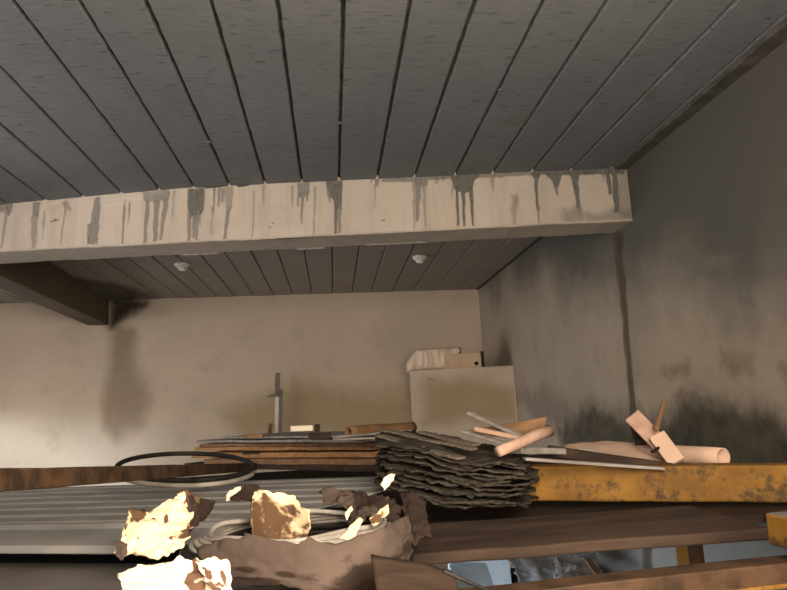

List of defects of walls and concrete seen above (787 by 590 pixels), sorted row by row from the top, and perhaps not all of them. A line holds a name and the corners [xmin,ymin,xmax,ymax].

water stain [31,202,44,247]
water stain [87,197,100,244]
water stain [143,190,174,243]
water stain [187,187,233,241]
water stain [291,182,316,224]
water stain [326,180,343,233]
water stain [413,174,479,226]
water stain [532,168,619,220]
water stain [559,407,634,445]
water stain [659,401,787,463]